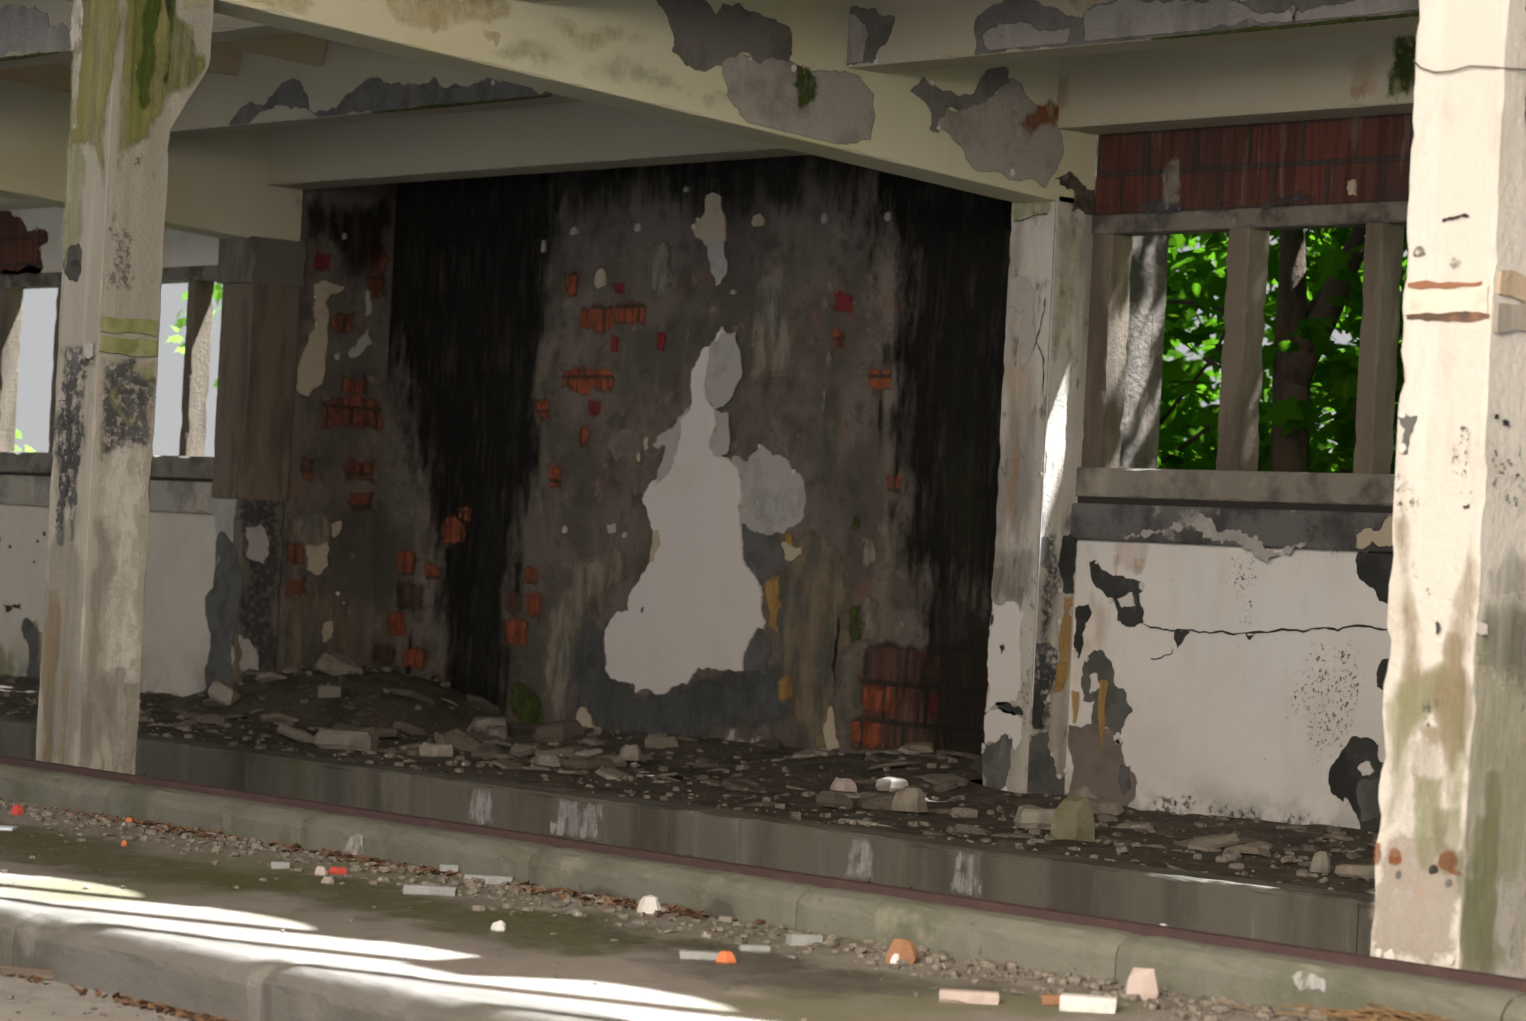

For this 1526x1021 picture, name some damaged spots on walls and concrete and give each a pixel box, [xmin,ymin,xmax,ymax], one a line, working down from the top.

flaking render [656,0,895,144]
peeling [851,0,1419,806]
peeling [21,618,42,679]
crack [1144,624,1388,660]